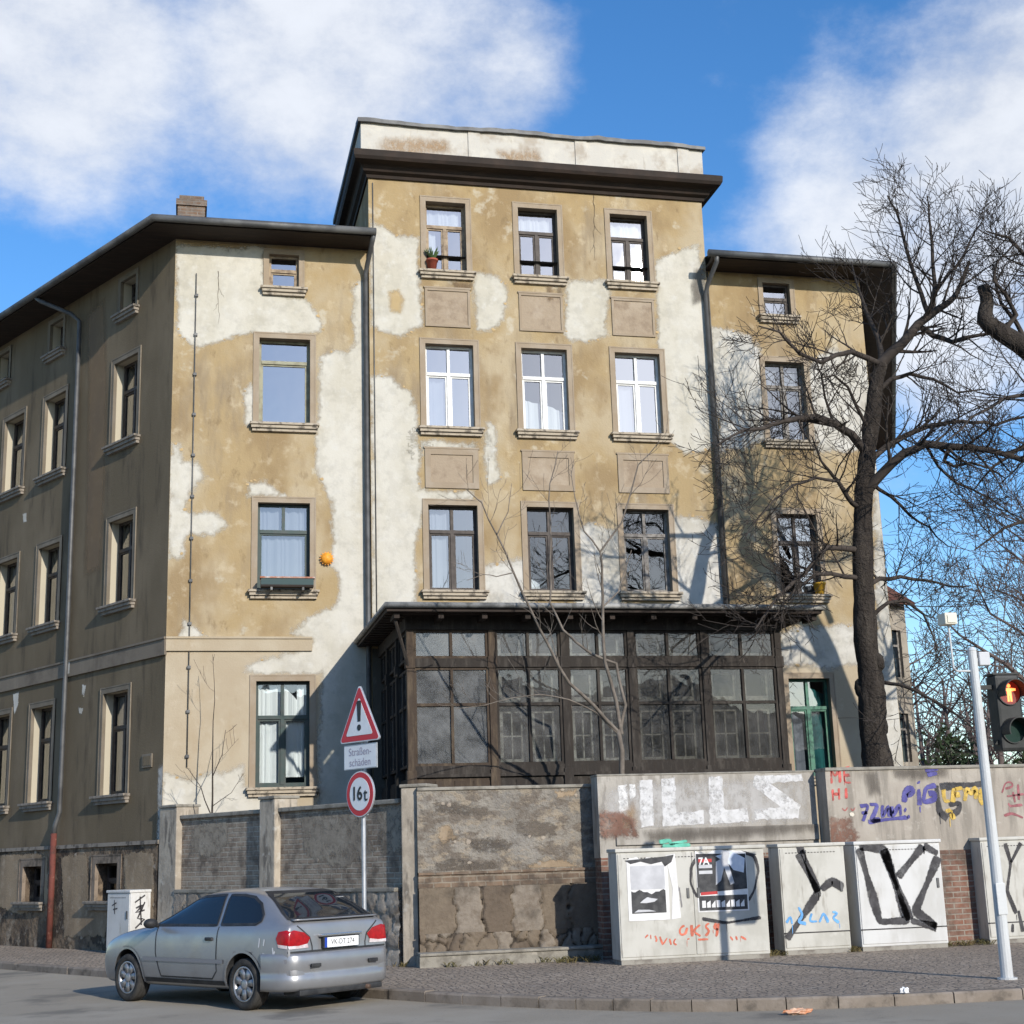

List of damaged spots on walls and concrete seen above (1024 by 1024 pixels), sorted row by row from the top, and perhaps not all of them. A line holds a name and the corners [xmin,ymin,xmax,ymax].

peeling [175,245,325,347]
peeling [564,279,610,342]
peeling [655,244,764,454]
peeling [168,442,227,559]
peeling [246,223,507,869]
peeling [780,624,857,670]